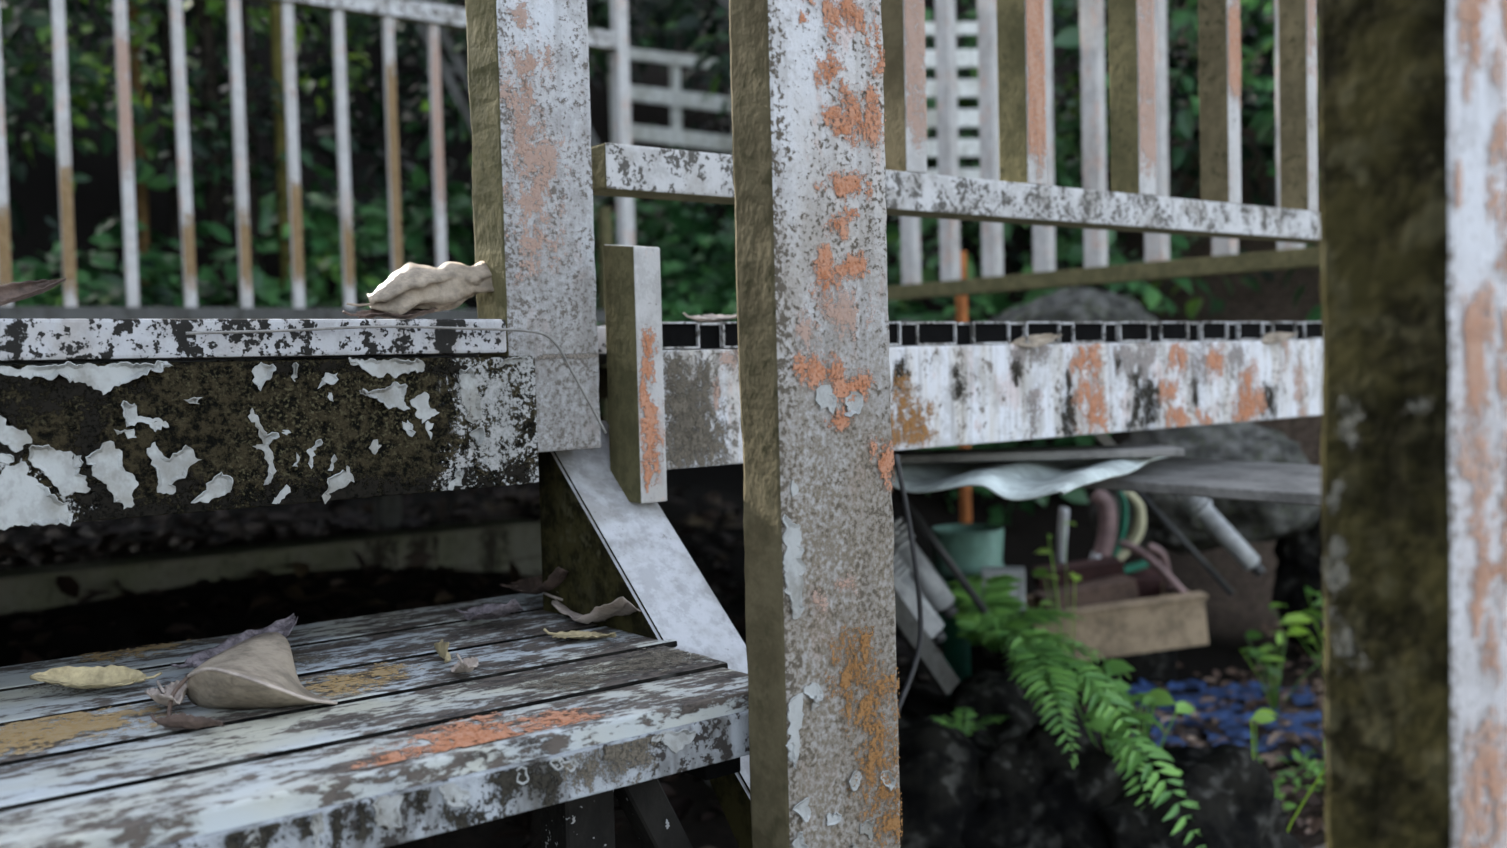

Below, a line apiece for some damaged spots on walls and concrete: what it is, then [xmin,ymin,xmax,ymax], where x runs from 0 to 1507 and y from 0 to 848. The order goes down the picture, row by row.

corrosion [797,0,886,151]
peeling [0,360,201,531]
peeling [191,472,233,503]
peeling [252,362,299,391]
peeling [248,408,354,504]
peeling [318,356,539,491]
corrosion [639,327,665,493]
corrosion [792,169,938,490]
corrosion [1454,0,1507,689]
peeling [372,795,404,830]
corrosion [350,706,614,769]
corrosion [823,620,903,848]